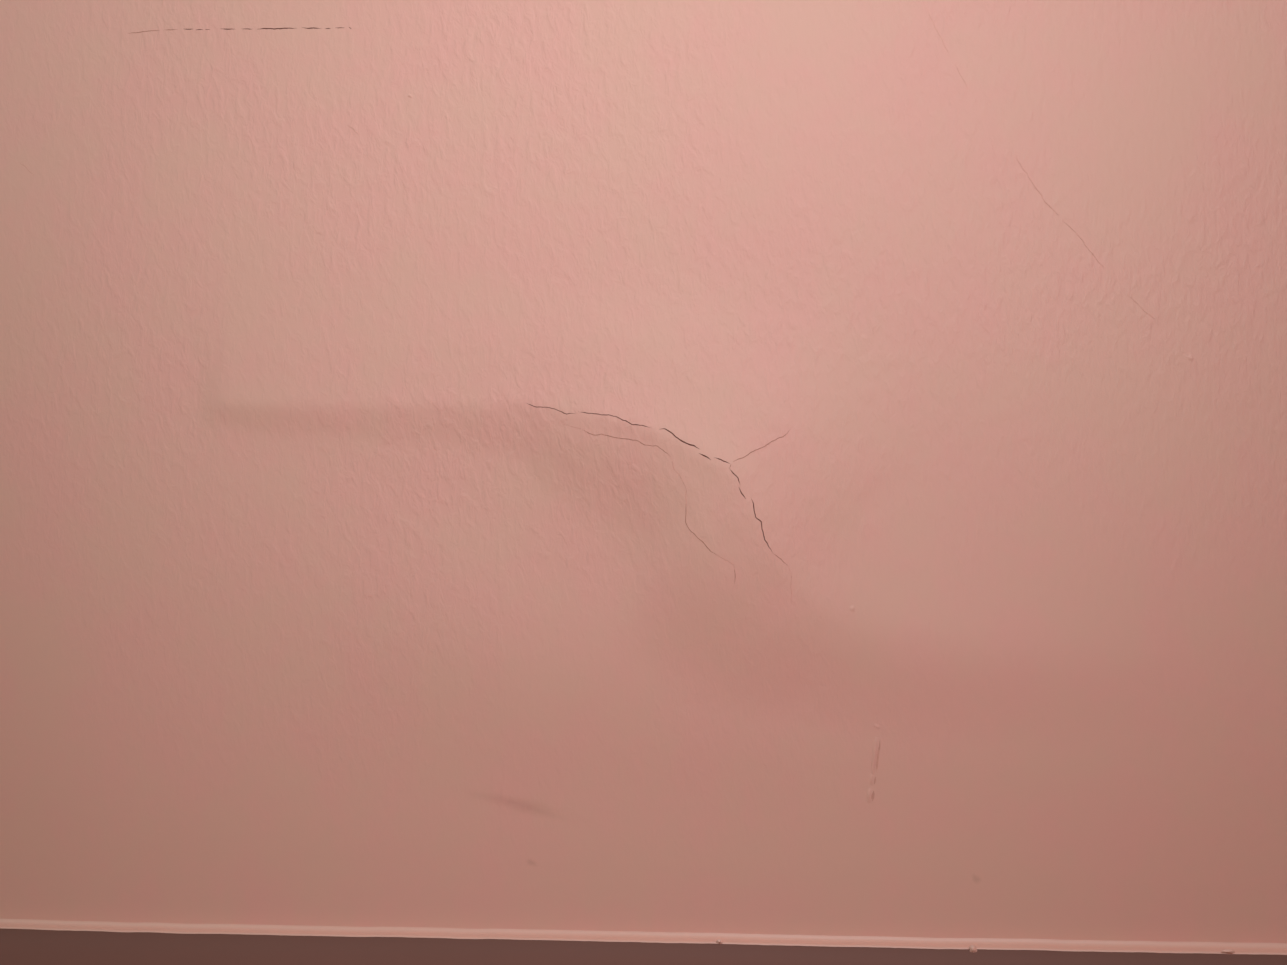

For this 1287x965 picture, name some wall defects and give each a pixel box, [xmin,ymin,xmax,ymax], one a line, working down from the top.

crack [529,404,792,596]